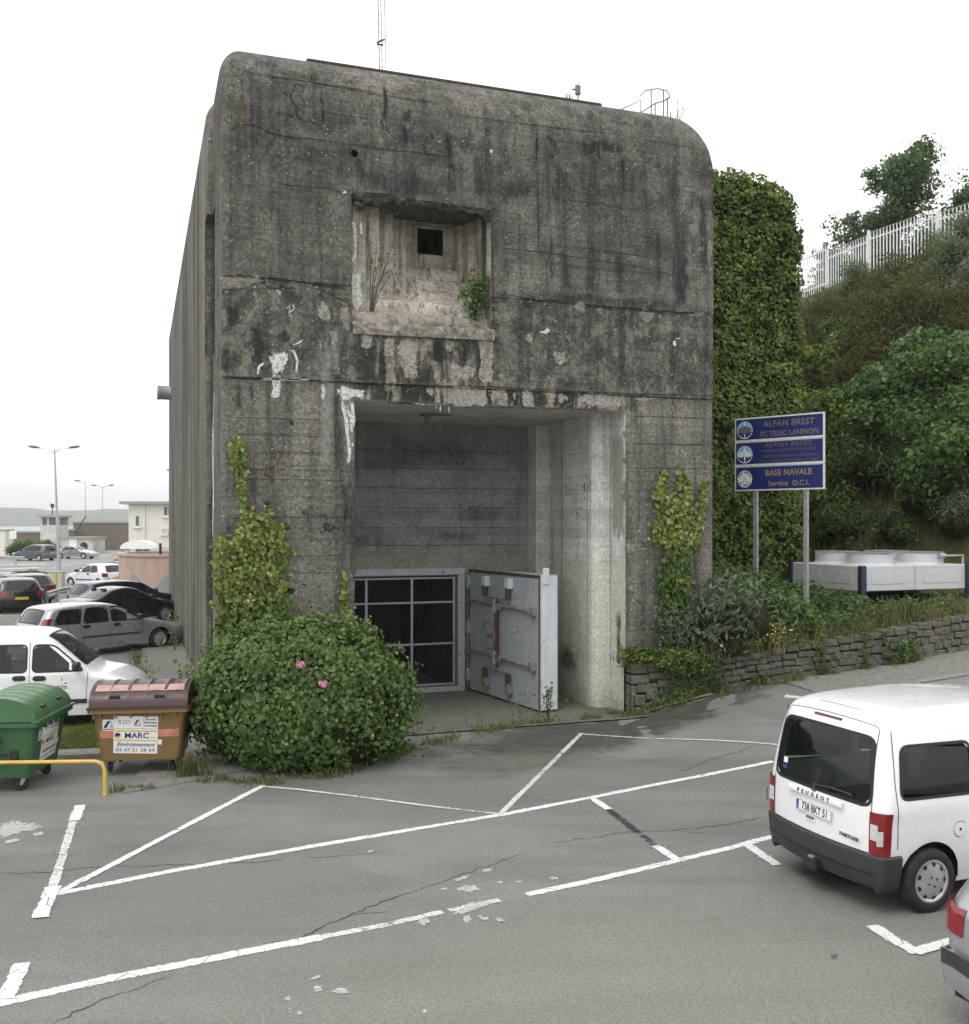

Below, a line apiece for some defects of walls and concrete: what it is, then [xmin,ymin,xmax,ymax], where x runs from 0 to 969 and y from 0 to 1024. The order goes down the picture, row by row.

crack [228,76,444,156]
leakage [574,139,625,184]
leakage [550,229,689,372]
leakage [251,328,308,398]
leakage [427,345,468,381]
leakage [386,391,602,416]
leakage [321,336,369,576]
rust [469,569,540,711]